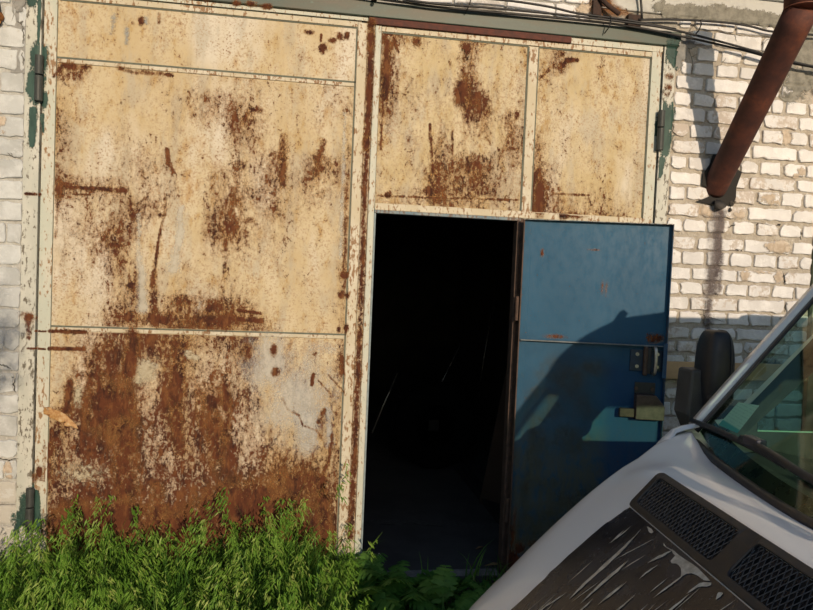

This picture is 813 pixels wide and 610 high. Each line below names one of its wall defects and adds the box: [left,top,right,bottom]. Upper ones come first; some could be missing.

rust [532,108,628,220]
rust [20,17,584,572]
leakage [704,209,725,330]